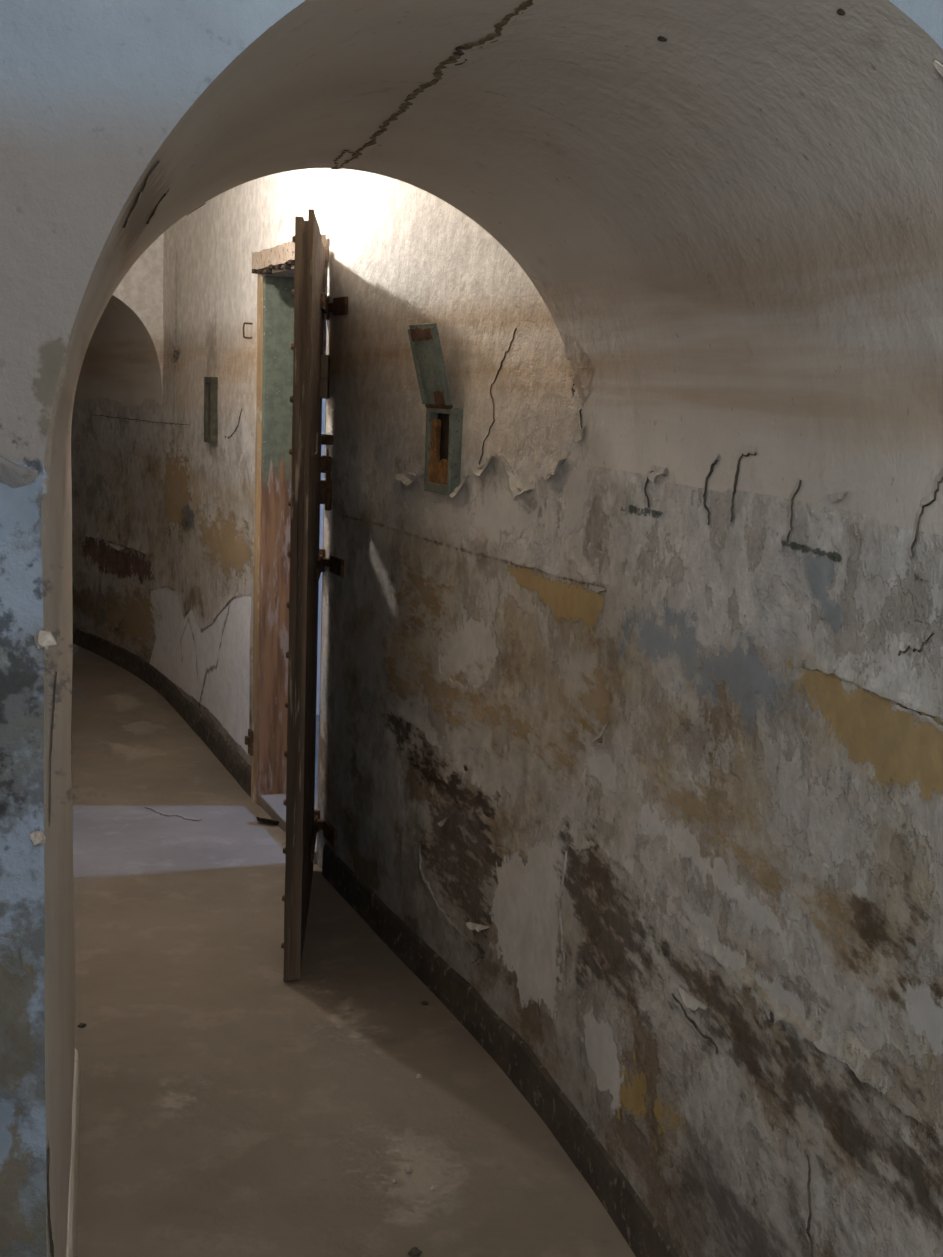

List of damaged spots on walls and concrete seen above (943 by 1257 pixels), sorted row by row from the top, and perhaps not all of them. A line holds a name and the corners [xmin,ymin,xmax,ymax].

crack [331,0,550,170]
crack [478,325,517,466]
peeling [392,435,609,628]
crack [702,445,757,525]
crack [784,478,848,542]
crack [908,468,943,560]
peeling [78,525,252,754]
crack [896,624,934,656]
peeling [788,645,943,800]
damp [803,873,943,1009]